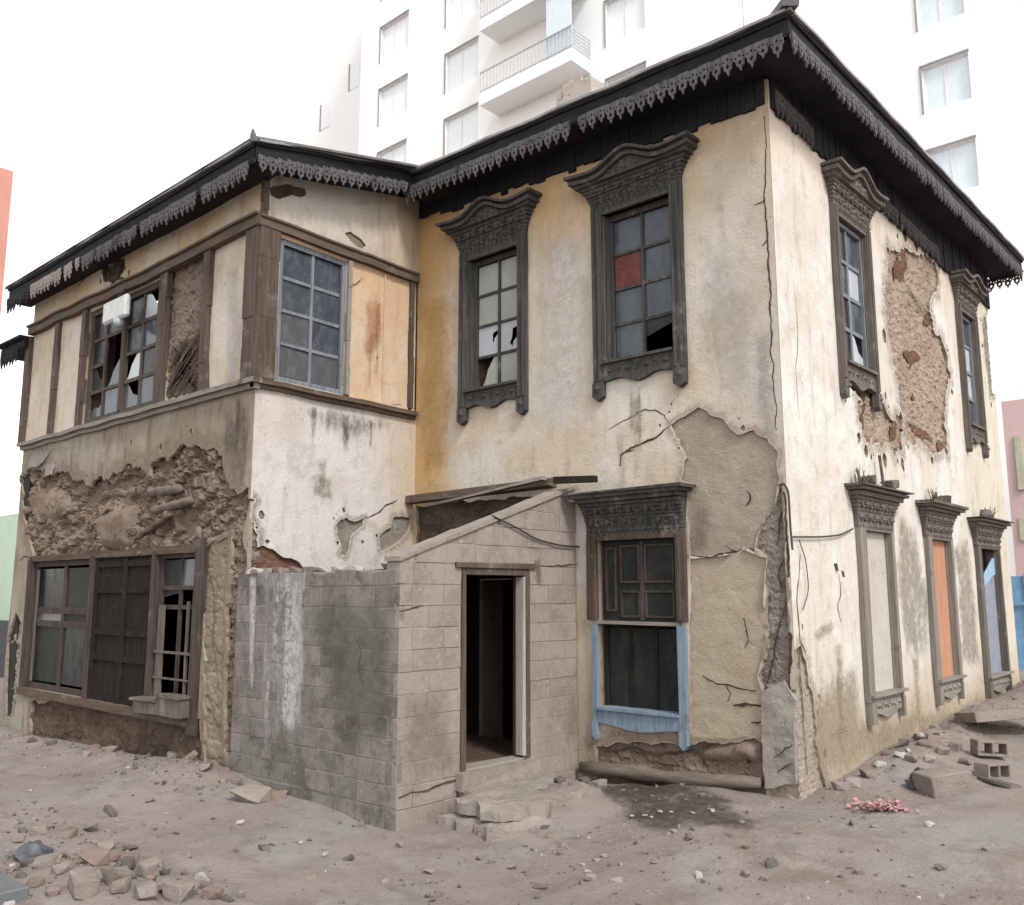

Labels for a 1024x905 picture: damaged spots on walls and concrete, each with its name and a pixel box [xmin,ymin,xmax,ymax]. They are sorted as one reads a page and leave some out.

peeling [28,449,56,476]
spalling [7,491,268,767]
peeling [335,508,366,558]
peeling [375,512,411,551]
crack [608,409,670,466]
peeling [589,407,830,801]
crack [687,486,808,775]
crack [754,116,800,430]
peeling [856,234,953,467]